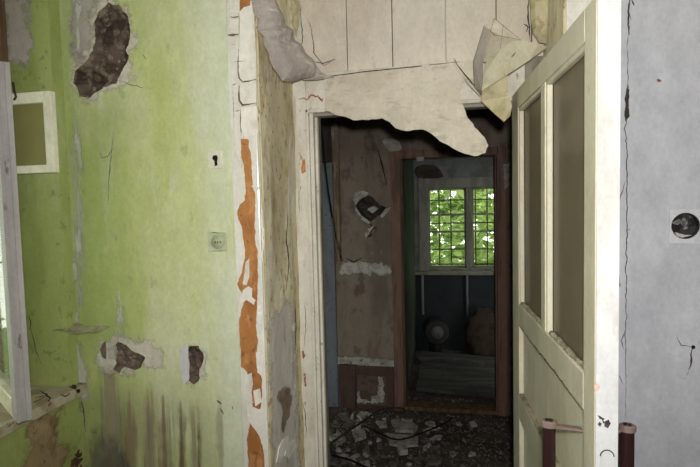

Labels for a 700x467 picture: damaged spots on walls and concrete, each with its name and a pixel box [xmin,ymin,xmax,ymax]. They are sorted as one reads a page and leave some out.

spalling [69,0,139,104]
peeling [453,0,548,122]
peeling [70,122,83,324]
peeling [228,0,333,467]
spalling [353,191,391,238]
crack [619,0,634,416]
spalling [72,293,164,400]
spalling [179,345,207,386]
peeling [357,377,385,404]
crack [677,338,695,370]